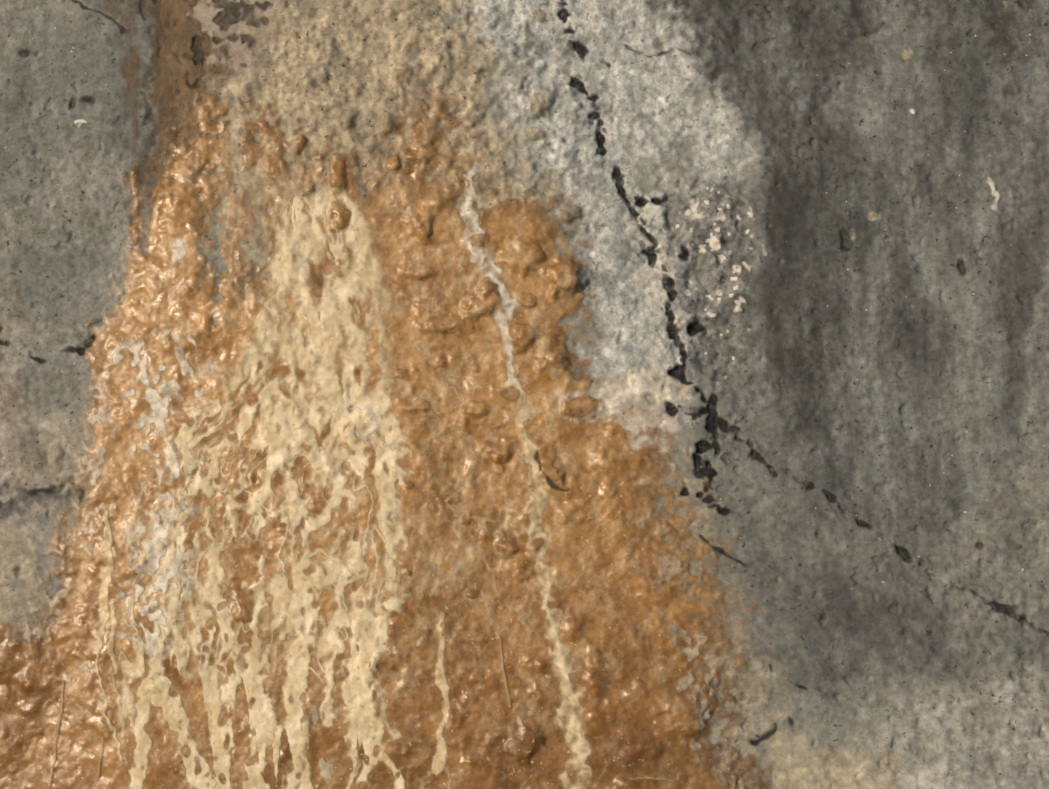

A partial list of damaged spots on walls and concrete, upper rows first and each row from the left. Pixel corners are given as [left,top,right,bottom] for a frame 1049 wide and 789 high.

damp [0,188,410,789]
rust [0,0,767,789]
crack [535,452,569,491]
damp [461,0,899,789]
crack [558,0,871,529]
crack [700,535,744,565]
crack [897,547,911,561]
crack [973,592,1045,632]